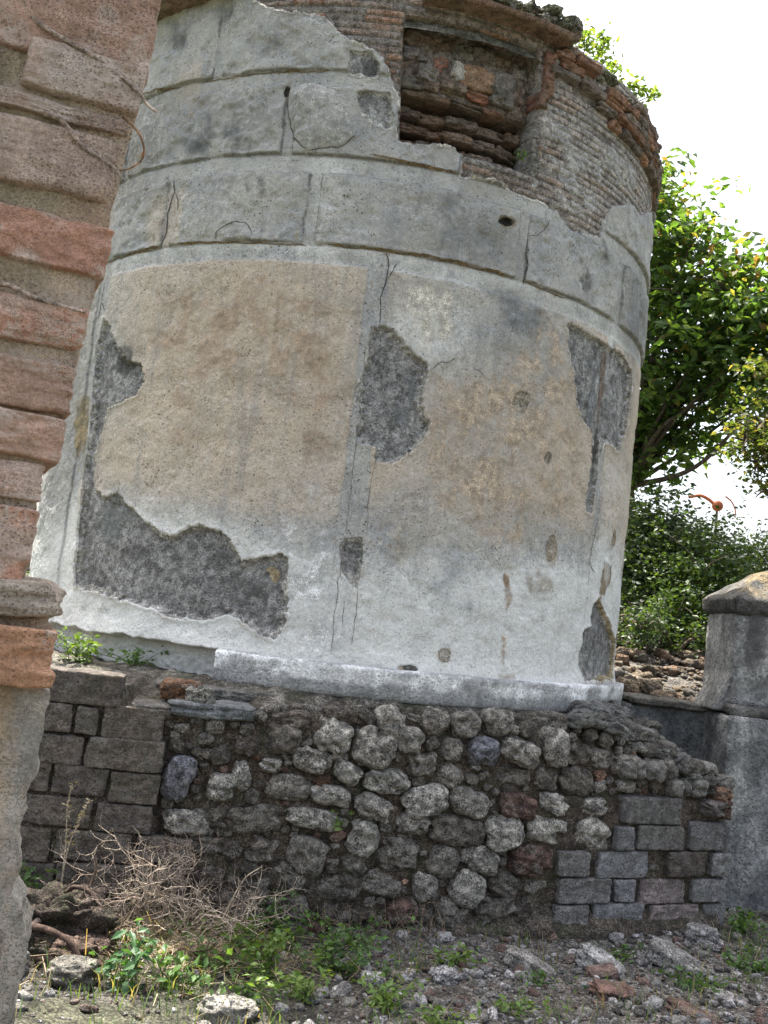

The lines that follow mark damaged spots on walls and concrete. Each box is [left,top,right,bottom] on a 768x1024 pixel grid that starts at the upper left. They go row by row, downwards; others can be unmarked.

crack [287,95,354,151]
flaking render [252,0,653,238]
crack [161,184,178,244]
crack [380,254,398,320]
crack [523,216,549,286]
flaking render [353,326,432,463]
flaking render [567,324,633,514]
flaking render [72,316,289,639]
flaking render [340,535,364,587]
flaking render [578,598,617,684]